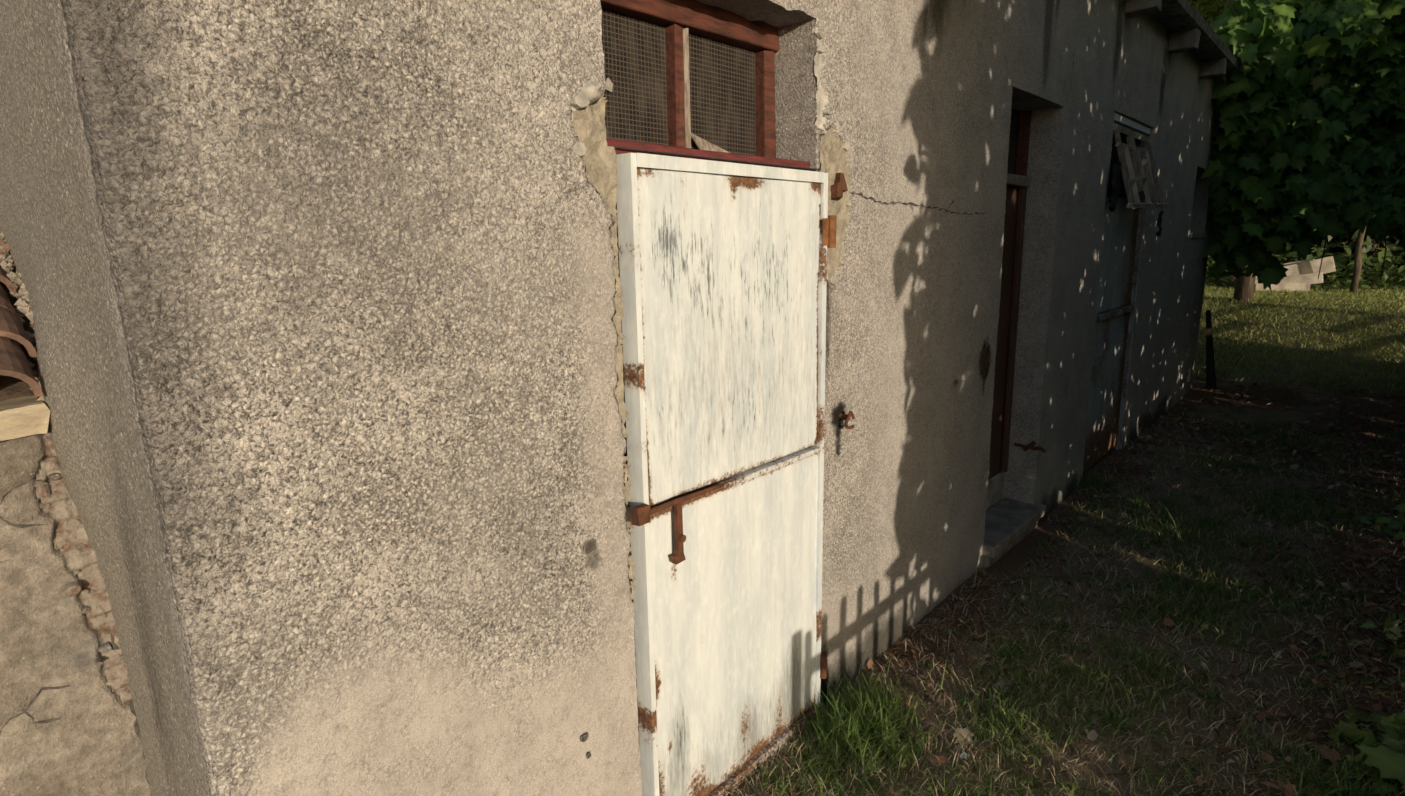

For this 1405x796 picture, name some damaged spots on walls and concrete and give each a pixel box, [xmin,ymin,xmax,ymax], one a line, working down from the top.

spalling [814,29,853,285]
crack [852,192,985,233]
spalling [571,81,636,600]
crack [0,476,42,562]
crack [0,685,70,733]